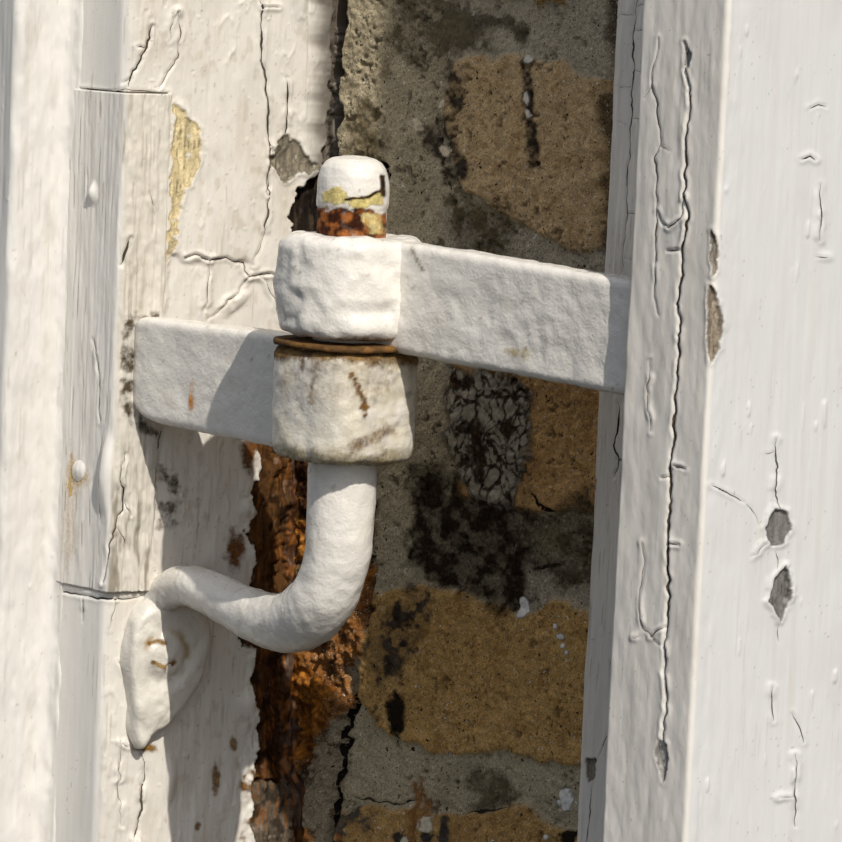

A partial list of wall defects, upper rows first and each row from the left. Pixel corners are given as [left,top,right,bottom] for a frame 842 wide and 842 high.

crack [89,0,182,93]
crack [121,240,129,263]
peeling [166,104,201,261]
crack [185,2,289,315]
peeling [269,0,385,235]
corrosion [316,207,387,238]
crack [617,0,691,741]
corrosion [68,453,83,496]
peeling [766,509,791,545]
peeling [769,566,792,619]
corrosion [288,653,335,760]
corrosion [241,770,259,798]